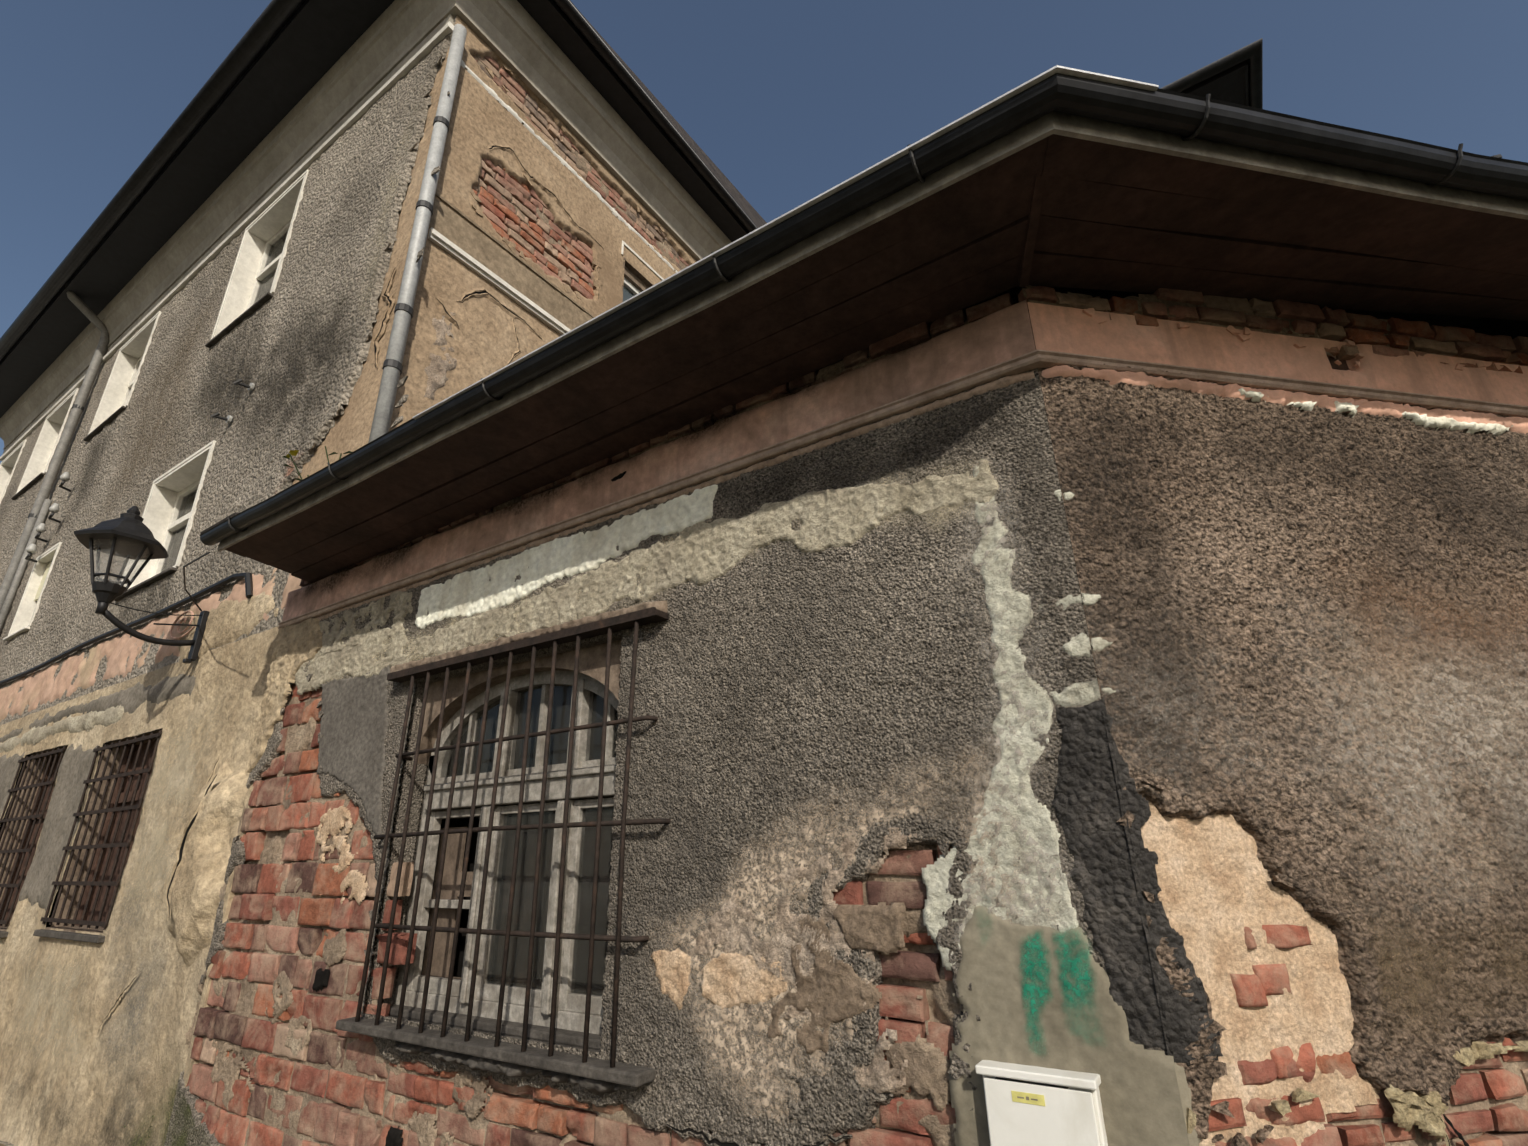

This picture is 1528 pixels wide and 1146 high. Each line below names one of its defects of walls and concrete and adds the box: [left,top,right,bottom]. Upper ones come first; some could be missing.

flaking render [470,158,603,300]
flaking render [0,285,1528,722]
flaking render [185,673,713,1146]
flaking render [651,827,970,1146]
flaking render [1117,777,1528,1146]
crack [1420,1095,1469,1146]